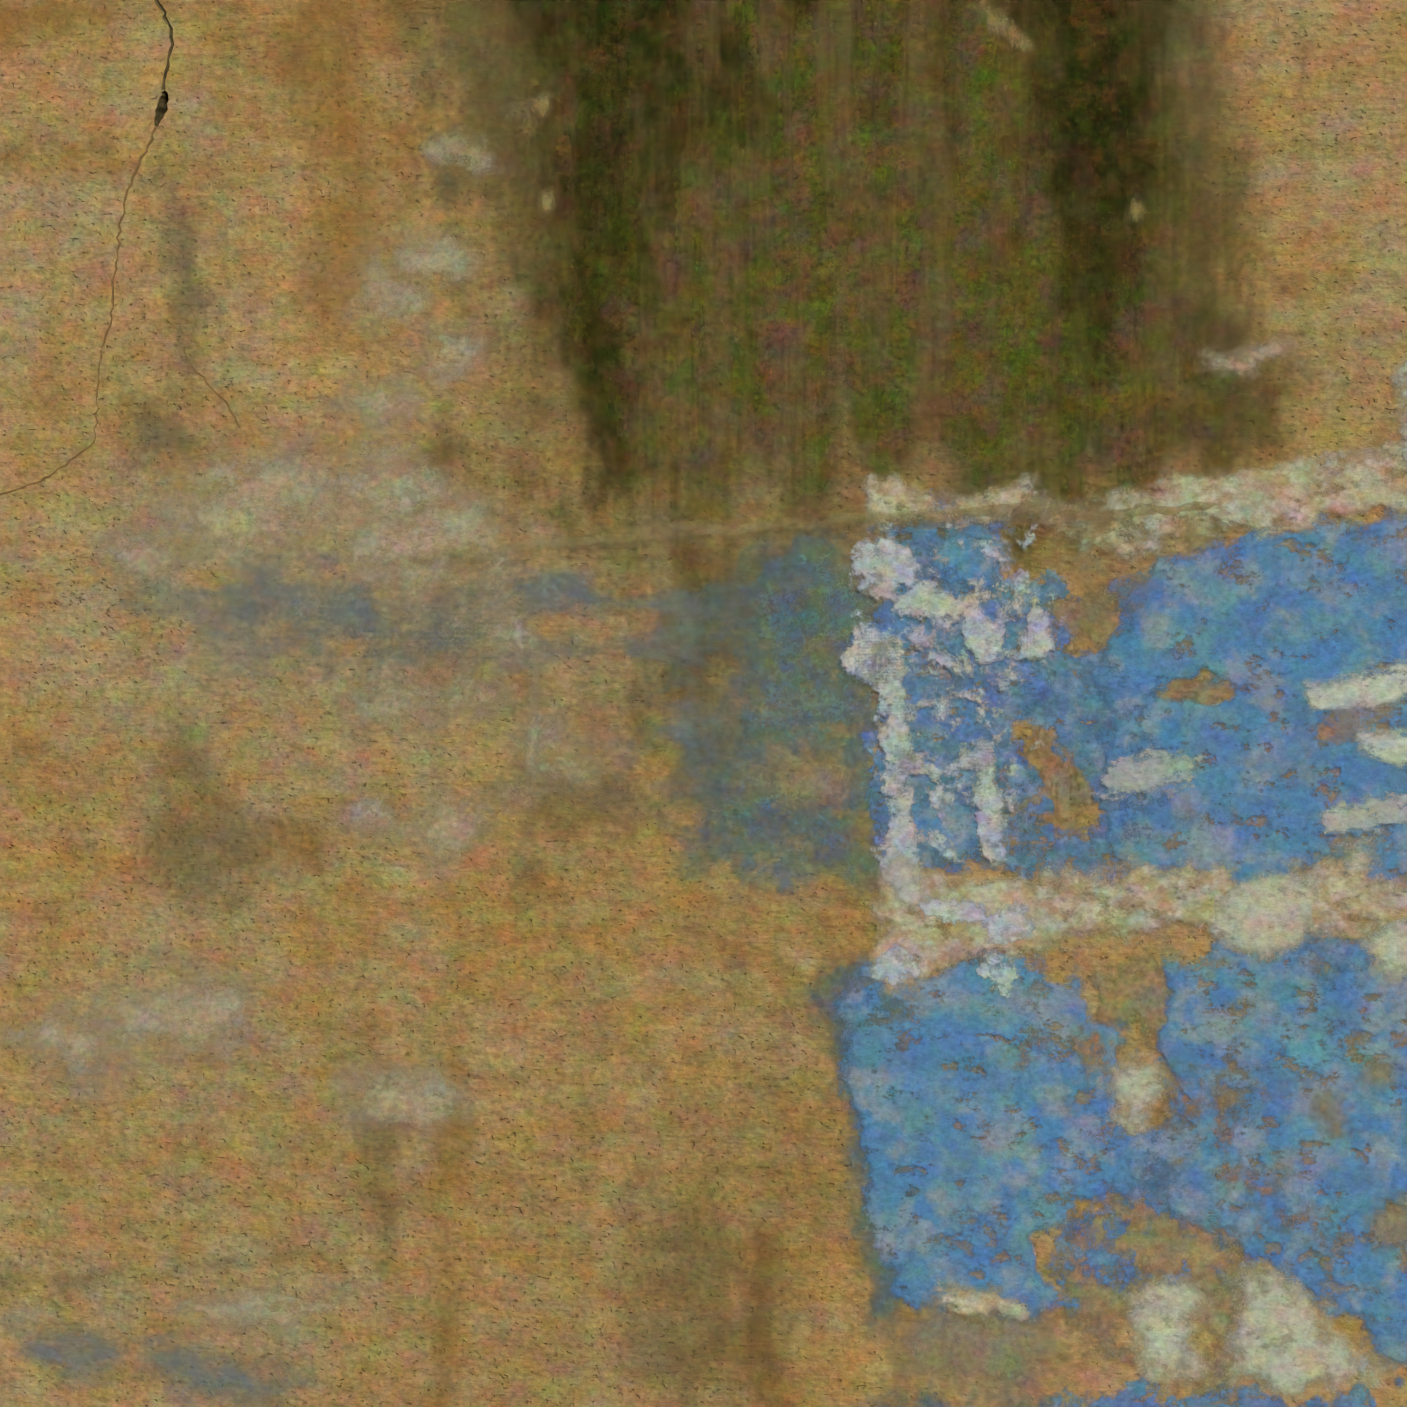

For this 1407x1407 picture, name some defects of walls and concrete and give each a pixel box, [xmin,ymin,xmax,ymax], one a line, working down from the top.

crack [0,0,174,495]
crack [183,347,241,428]
water stain [363,235,470,316]
water stain [424,135,490,170]
water stain [536,0,702,439]
water stain [982,0,1167,330]
water stain [1210,340,1285,372]
peeling [848,501,1407,892]
peeling [812,928,1407,1407]